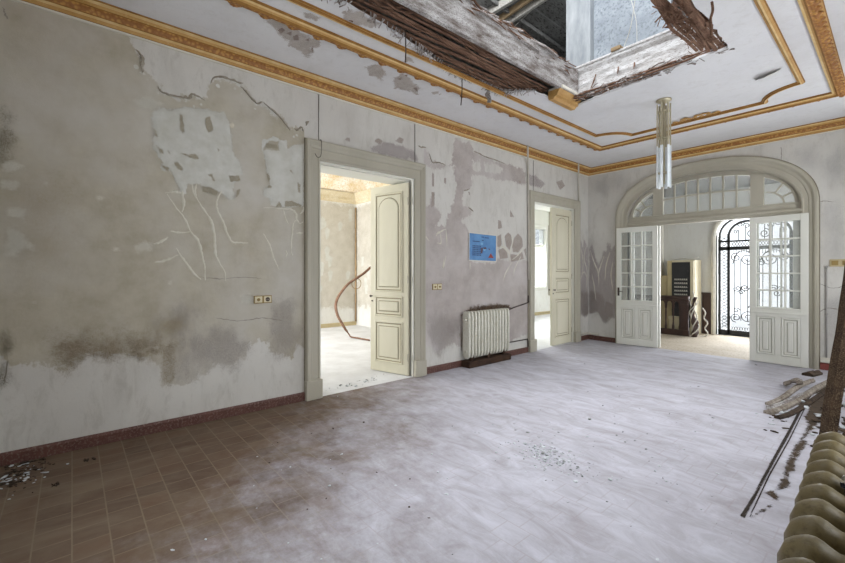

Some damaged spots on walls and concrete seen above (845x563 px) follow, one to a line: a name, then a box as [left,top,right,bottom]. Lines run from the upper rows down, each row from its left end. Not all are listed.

peeling [263,19,321,58]
peeling [364,64,420,95]
spalling [151,106,245,281]
spalling [261,136,304,270]
peeling [371,138,546,354]
leakage [581,240,615,323]
leakage [43,295,252,390]